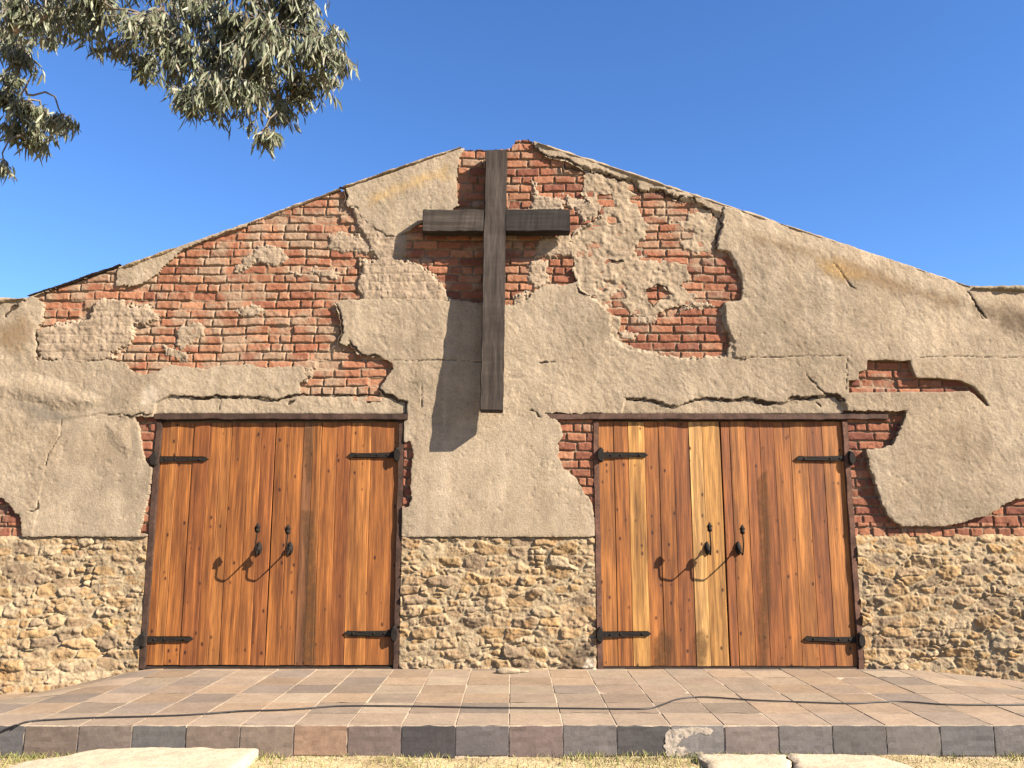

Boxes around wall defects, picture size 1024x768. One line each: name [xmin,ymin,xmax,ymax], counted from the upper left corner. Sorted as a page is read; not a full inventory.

spalling [453,140,742,359]
spalling [36,191,483,405]
crack [967,291,986,319]
crack [180,389,422,414]
crack [624,355,847,408]
spalling [848,361,985,404]
spalling [137,416,158,467]
spalling [545,412,602,512]
spalling [842,411,1024,536]
spalling [0,498,22,536]
spalling [141,484,152,534]